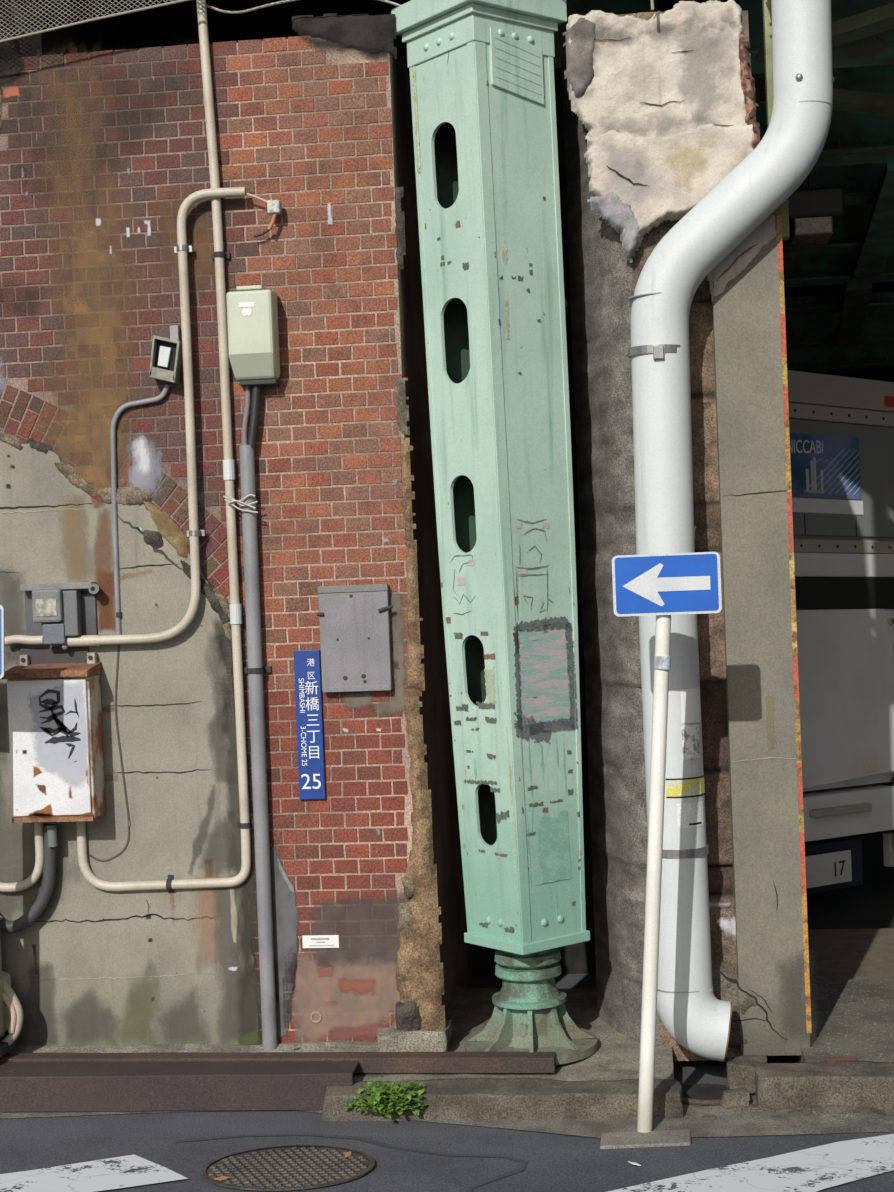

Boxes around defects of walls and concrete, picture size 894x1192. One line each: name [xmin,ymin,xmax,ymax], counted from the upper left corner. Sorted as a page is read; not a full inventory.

spalling [0,87,20,132]
water stain [48,206,160,492]
spalling [0,432,232,640]
peeling [454,701,497,731]
rust [29,767,53,818]
peeling [464,750,500,793]
peeling [528,786,573,813]
crack [35,900,225,923]
crack [713,967,787,1040]